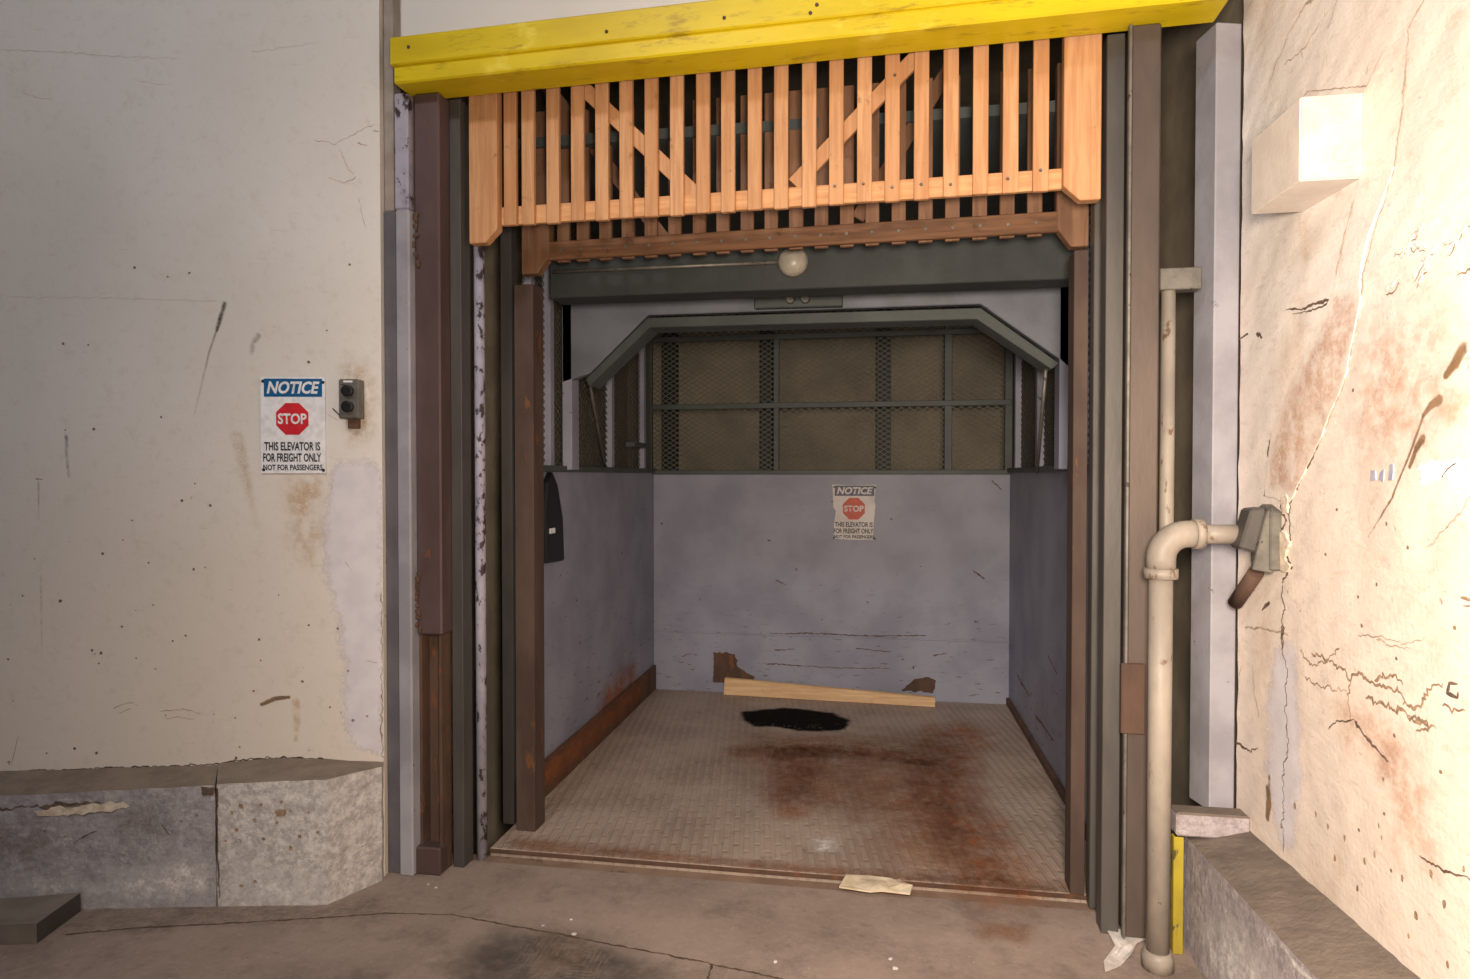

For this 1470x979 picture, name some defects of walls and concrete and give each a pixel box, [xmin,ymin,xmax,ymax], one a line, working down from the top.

crack [1269,0,1424,143]
flaking render [1385,220,1470,296]
rust [1380,344,1466,518]
crack [1426,497,1470,548]
crack [1234,503,1465,852]
spalling [35,801,129,816]
crack [1419,855,1470,880]